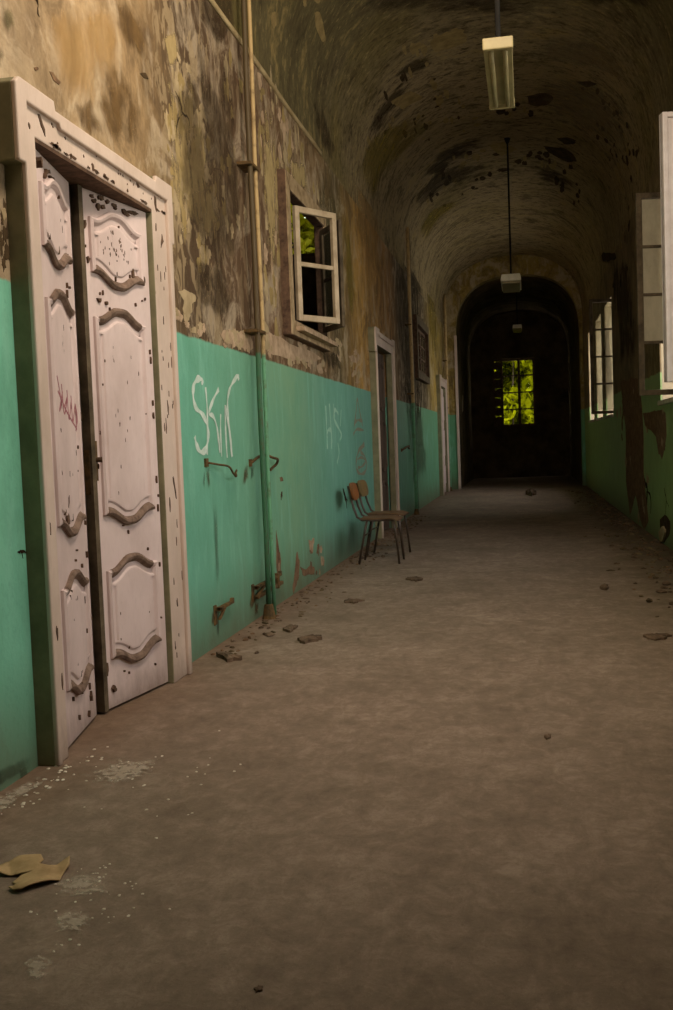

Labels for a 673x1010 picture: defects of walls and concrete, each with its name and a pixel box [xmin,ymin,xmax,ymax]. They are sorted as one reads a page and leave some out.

peeling [303,0,326,42]
damp [371,58,428,130]
peeling [28,34,225,337]
damp [417,139,485,204]
flaking render [0,198,10,272]
peeling [616,377,667,529]
flaking render [293,538,325,594]